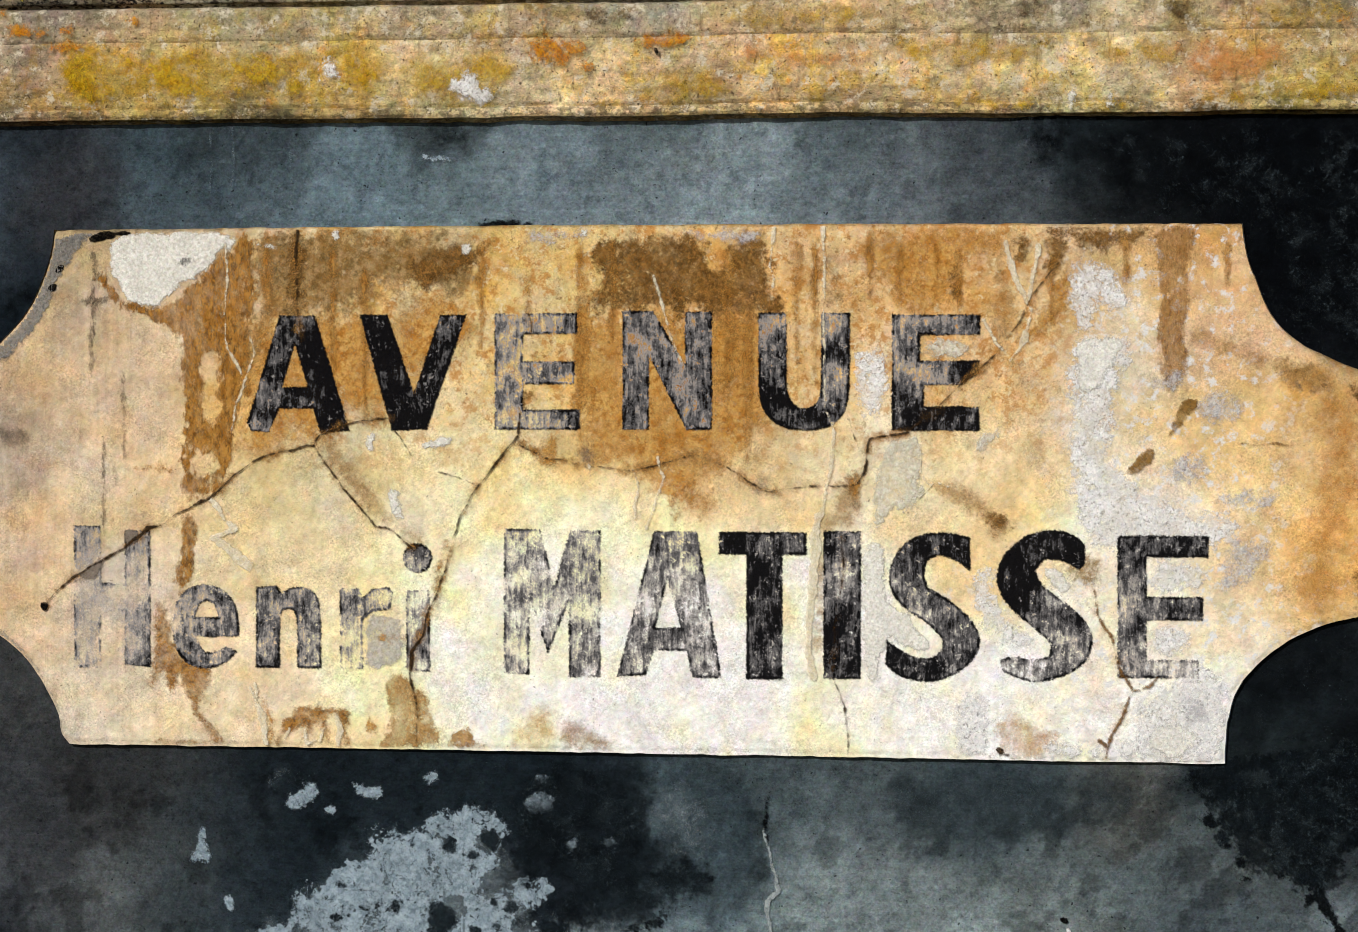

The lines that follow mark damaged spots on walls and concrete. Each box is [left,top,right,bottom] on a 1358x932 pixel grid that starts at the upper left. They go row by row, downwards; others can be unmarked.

peeling [0,231,236,359]
rust [93,232,271,498]
rust [571,232,819,433]
rust [1018,225,1206,390]
rust [176,517,197,587]
crack [49,415,413,607]
crack [409,270,1052,718]
crack [1093,590,1157,754]
peeling [286,783,336,814]
peeling [354,785,383,798]
peeling [258,804,555,932]
water stain [1183,738,1358,932]